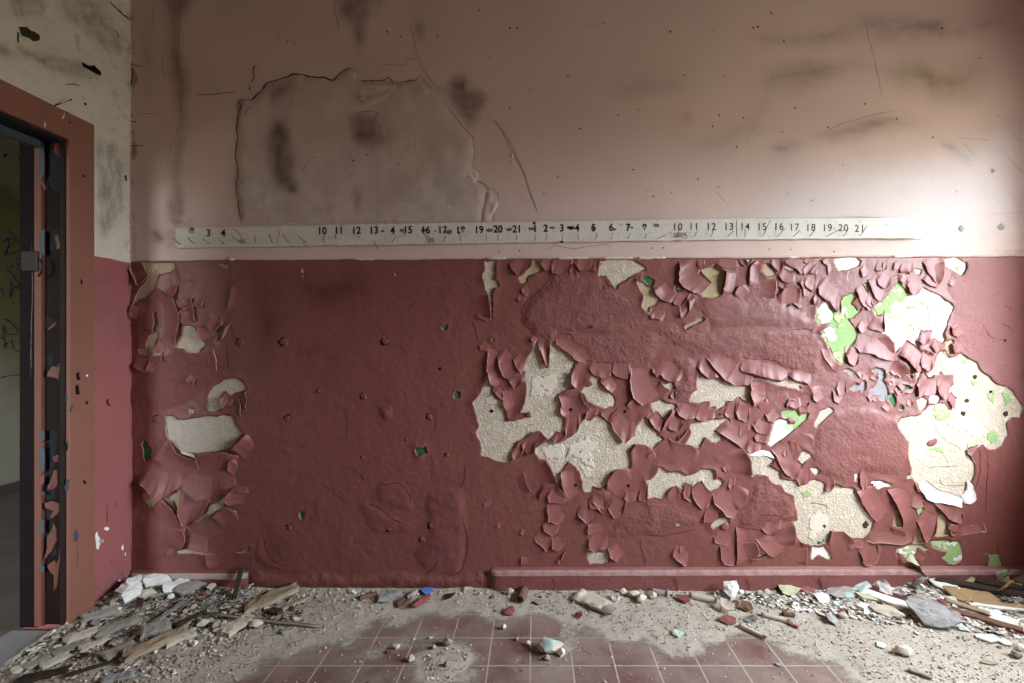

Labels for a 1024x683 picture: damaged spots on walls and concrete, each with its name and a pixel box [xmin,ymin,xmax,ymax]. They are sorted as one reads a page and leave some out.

crack [110,1,540,243]
peeling [129,262,237,373]
peeling [139,378,254,569]
peeling [473,248,1024,601]